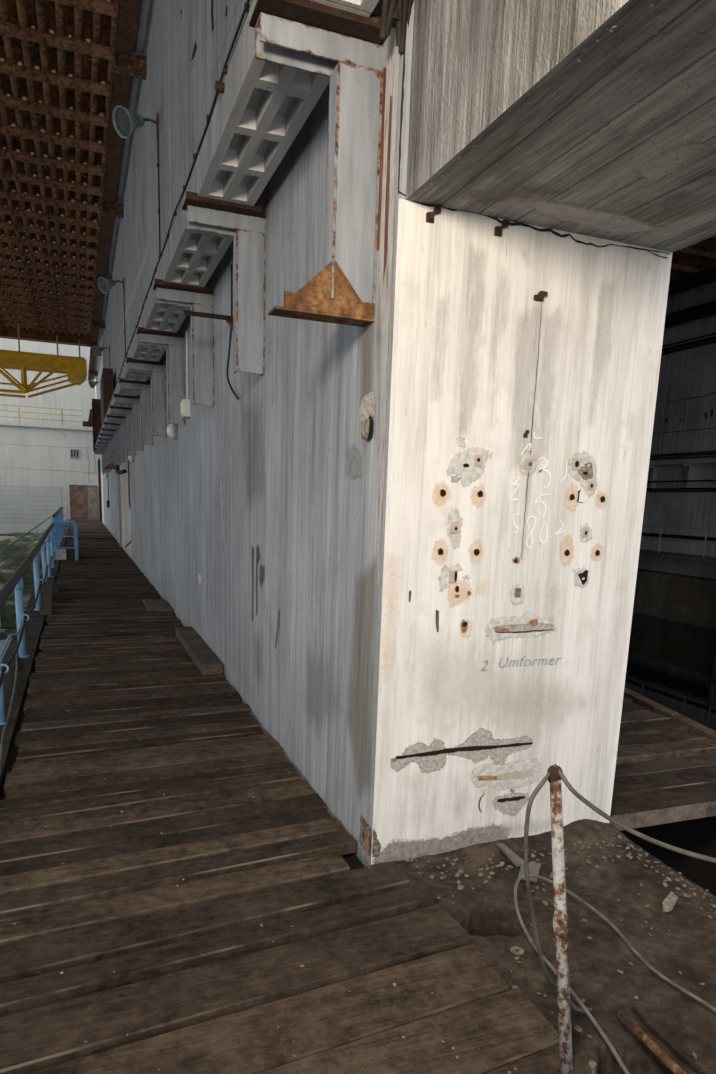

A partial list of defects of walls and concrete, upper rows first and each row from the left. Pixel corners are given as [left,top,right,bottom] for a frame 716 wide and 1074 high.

spalling [358,390,376,442]
spalling [446,437,493,487]
spalling [567,452,598,503]
spalling [447,508,463,550]
peeling [438,564,471,608]
spalling [572,567,589,588]
spalling [485,584,556,644]
peeling [390,728,541,817]
spalling [405,853,517,899]
spalling [520,833,716,919]